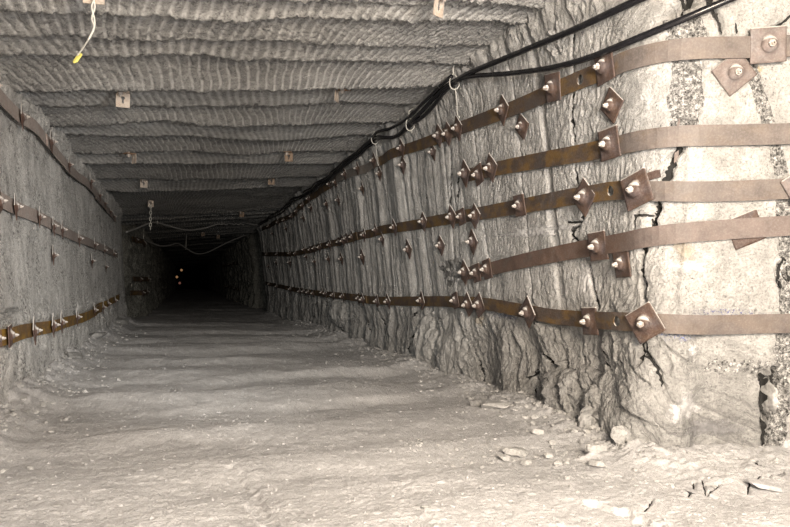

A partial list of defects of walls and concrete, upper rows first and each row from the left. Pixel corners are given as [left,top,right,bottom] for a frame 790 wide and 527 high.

crack [662,147,683,181]
crack [568,216,584,241]
crack [634,201,662,227]
crack [640,247,648,291]
crack [777,256,790,290]
crack [747,369,781,495]